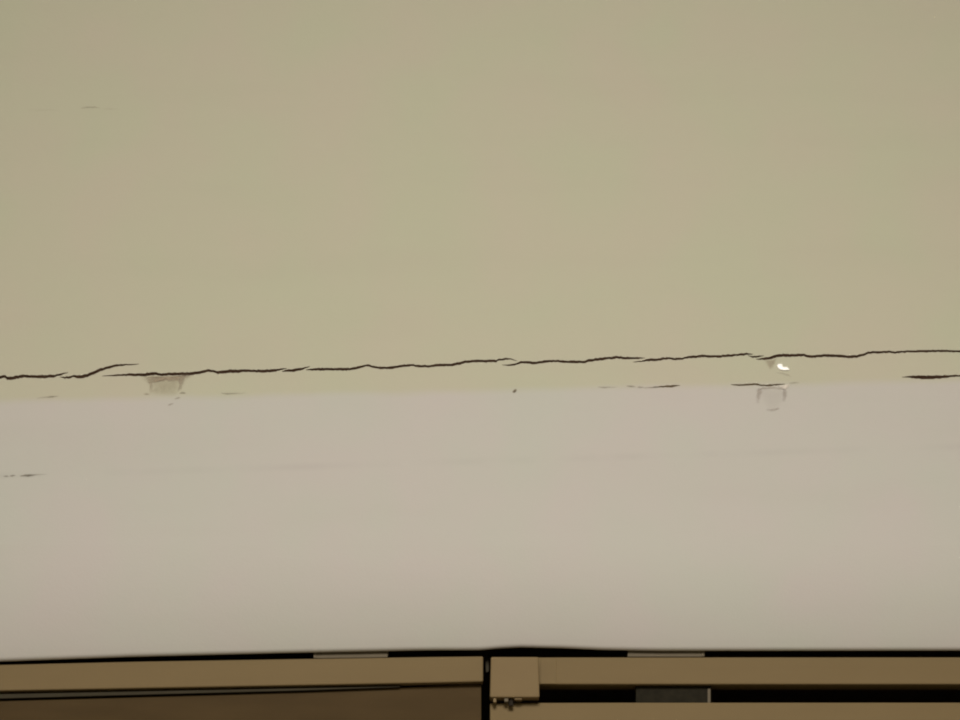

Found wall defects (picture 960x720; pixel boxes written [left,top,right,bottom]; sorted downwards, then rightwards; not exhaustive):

crack [0,350,960,381]
crack [731,380,783,388]